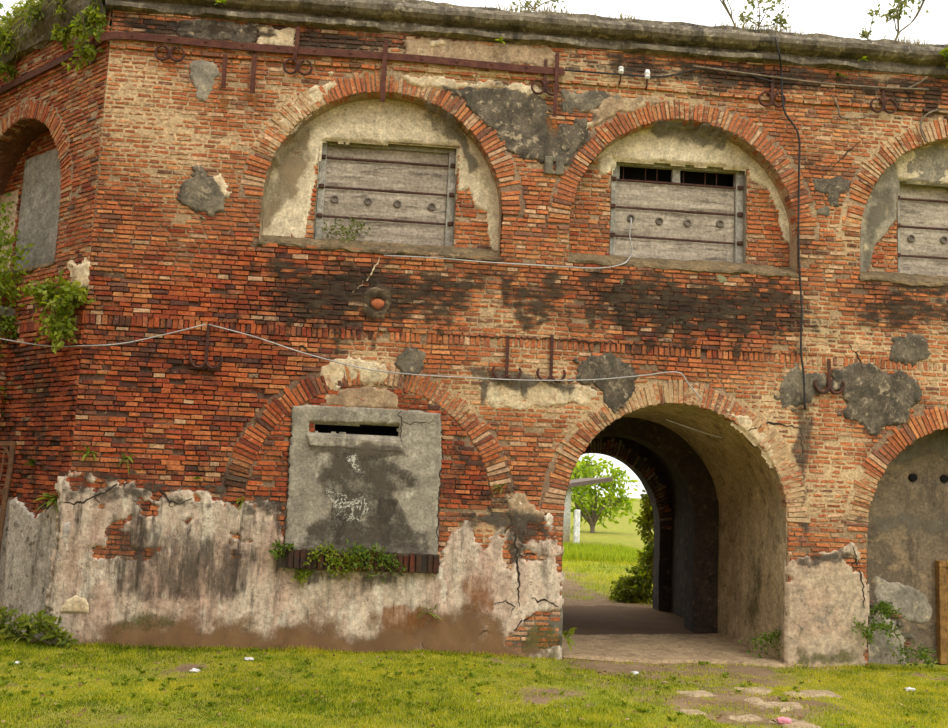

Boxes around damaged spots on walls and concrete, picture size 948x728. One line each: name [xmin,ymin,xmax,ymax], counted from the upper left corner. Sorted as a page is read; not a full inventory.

damp [302,442,430,557]
flaking render [503,492,549,525]
crack [494,517,559,631]
flaking render [505,607,563,650]